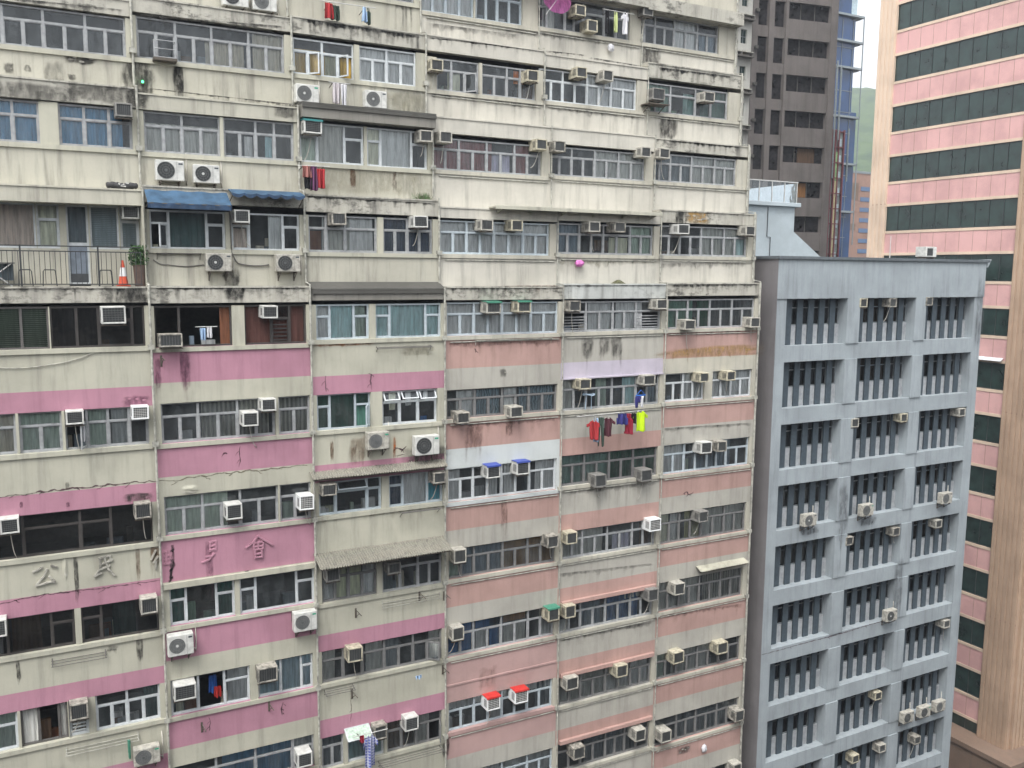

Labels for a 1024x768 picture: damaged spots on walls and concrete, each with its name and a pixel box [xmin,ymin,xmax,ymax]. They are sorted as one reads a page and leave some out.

damp [123,56,229,107]
rust [673,345,755,356]
crack [0,448,307,498]
crack [1,545,175,604]